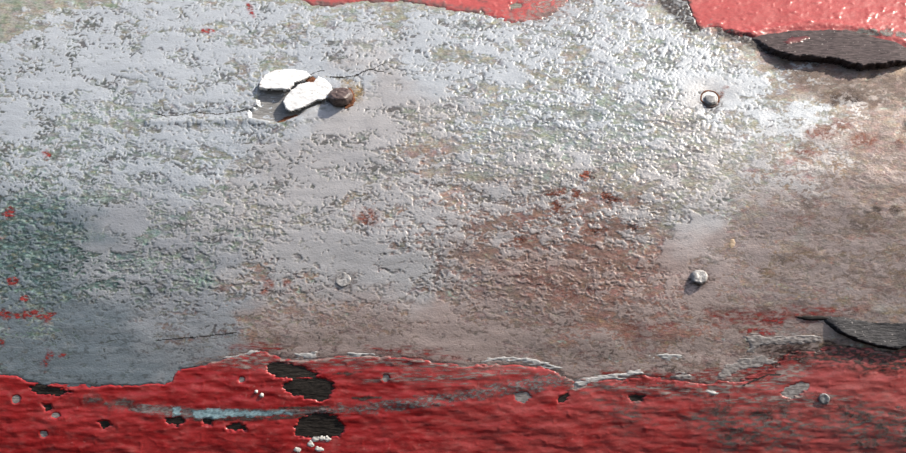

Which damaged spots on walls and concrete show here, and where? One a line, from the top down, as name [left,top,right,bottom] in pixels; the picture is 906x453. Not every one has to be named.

peeling [290,354,356,366]
peeling [223,352,334,402]
peeling [365,372,496,382]
peeling [602,382,691,396]
peeling [718,382,821,408]
peeling [759,357,815,390]
peeling [128,404,198,427]
peeling [219,408,344,438]